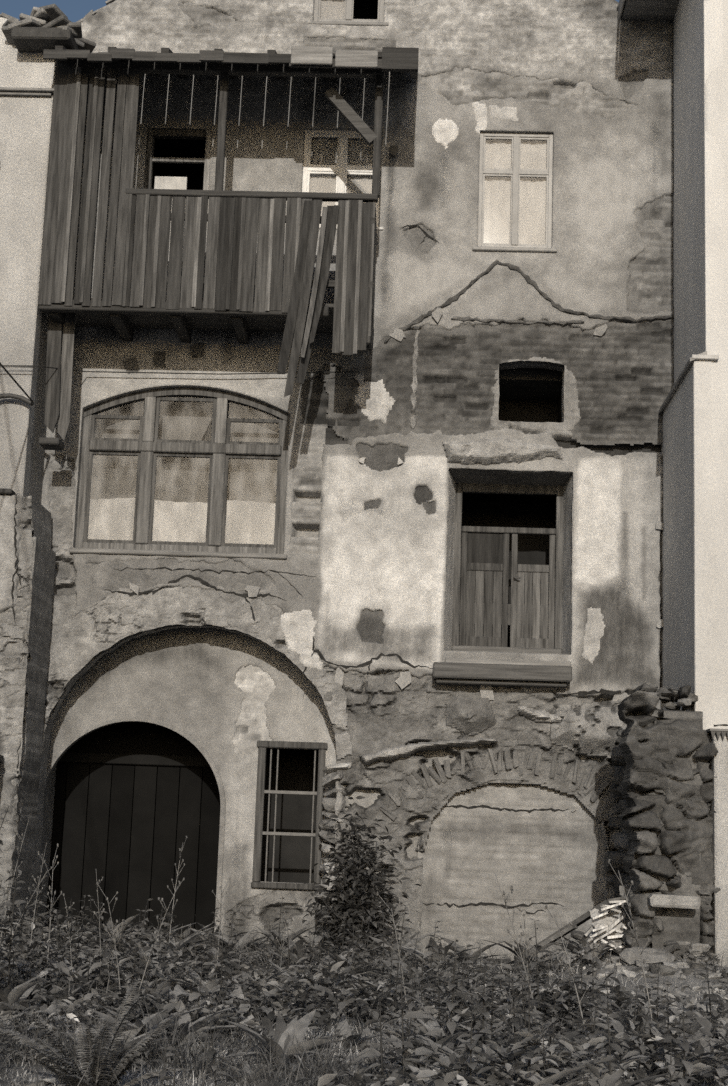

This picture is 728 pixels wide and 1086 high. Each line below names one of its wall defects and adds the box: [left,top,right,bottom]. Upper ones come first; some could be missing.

flaking render [404,67,648,119]
flaking render [290,195,673,556]
crack [109,567,315,621]
flaking render [0,496,34,849]
flaking render [43,455,633,952]
crack [432,805,576,813]
crack [423,902,562,914]